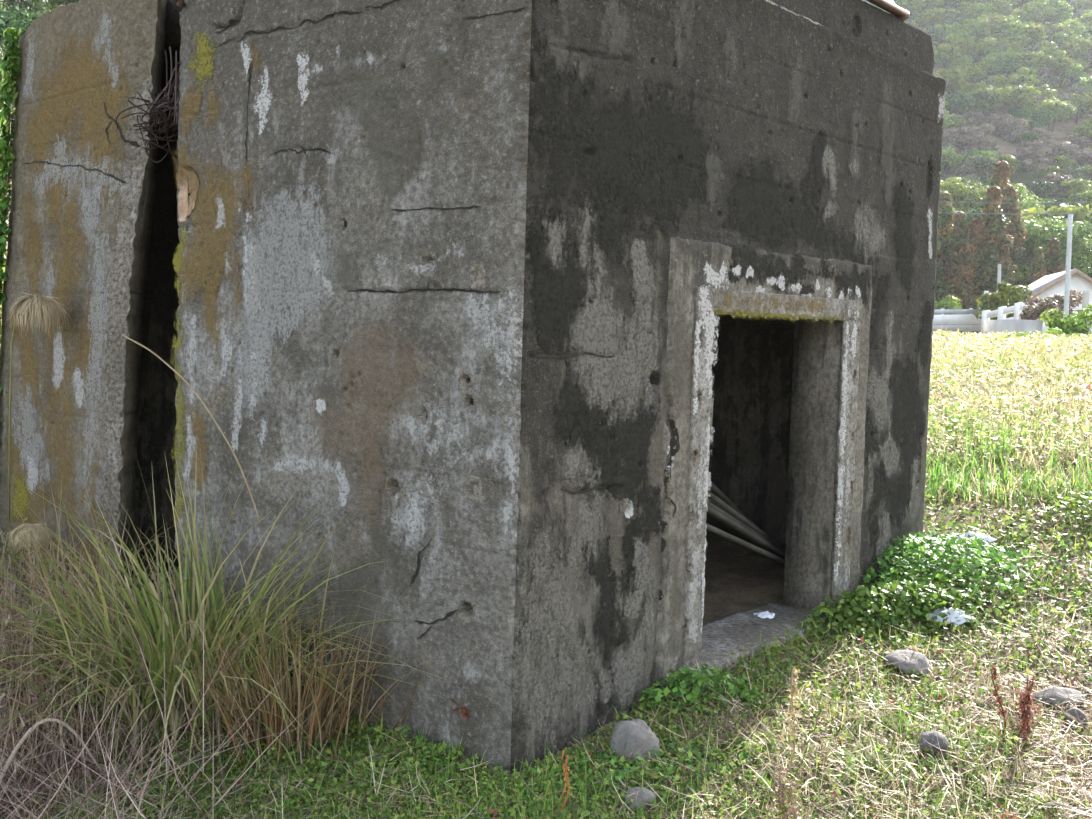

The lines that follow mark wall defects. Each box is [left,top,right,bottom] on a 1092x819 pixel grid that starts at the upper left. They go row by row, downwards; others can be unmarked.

damp [23,35,39,103]
damp [94,13,119,88]
crack [211,0,398,201]
damp [307,45,375,78]
crack [462,7,527,19]
spalling [177,165,200,222]
damp [35,136,131,515]
damp [379,0,934,718]
damp [12,383,50,500]
peeling [687,261,861,644]
damp [332,580,391,685]
crack [415,610,458,639]